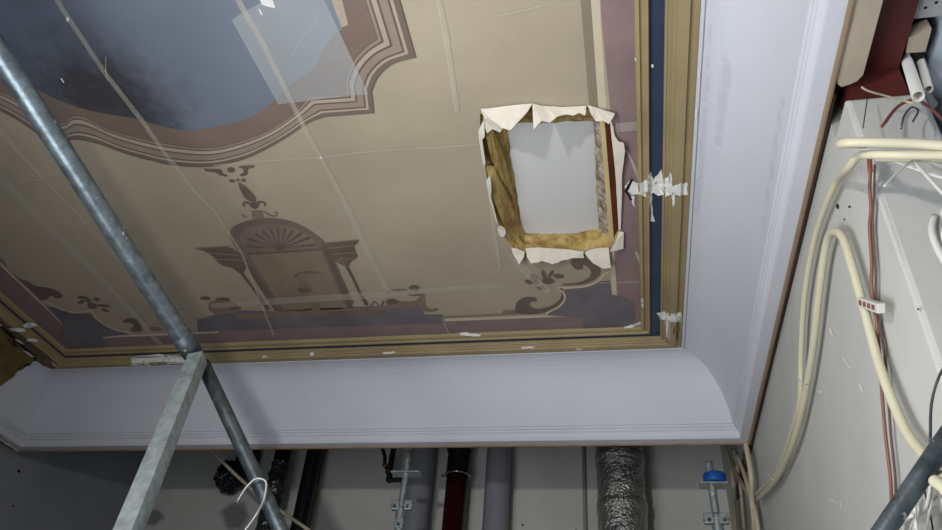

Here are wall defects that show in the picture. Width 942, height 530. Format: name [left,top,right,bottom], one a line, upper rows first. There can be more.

peeling [0,320,57,386]